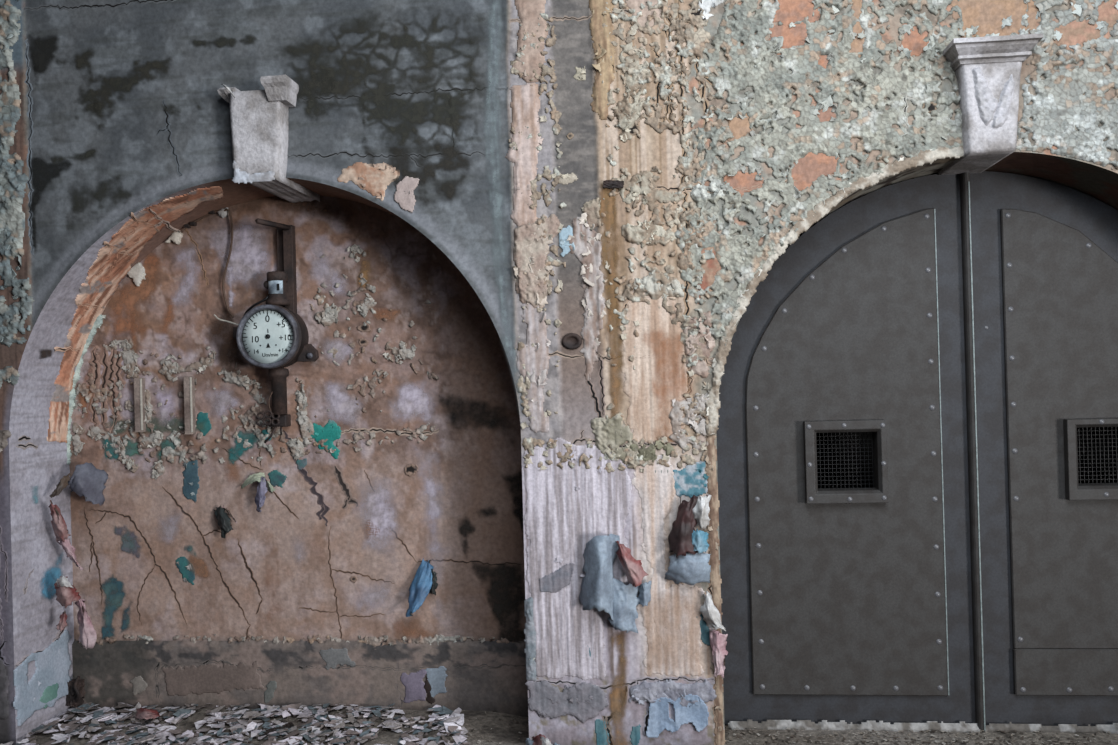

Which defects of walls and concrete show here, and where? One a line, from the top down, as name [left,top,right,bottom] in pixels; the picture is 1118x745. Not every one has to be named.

peeling [0,0,35,347]
crack [84,507,188,626]
flaking render [0,161,437,726]
crack [341,427,439,436]
damp [286,0,517,378]
crack [154,430,718,745]
crack [524,293,714,475]
peeling [228,0,1118,745]
crack [682,281,690,316]
crack [650,0,798,228]